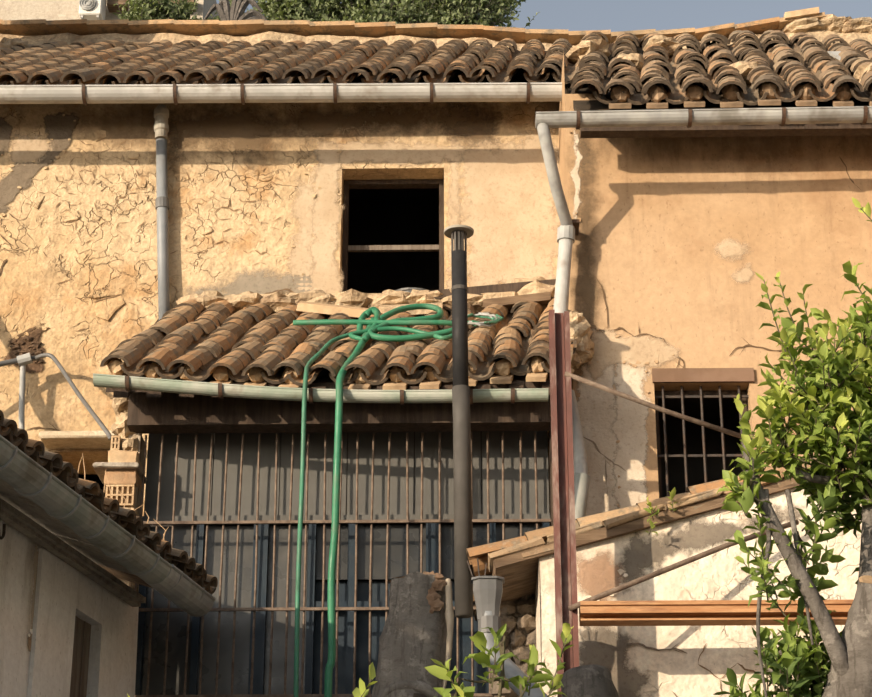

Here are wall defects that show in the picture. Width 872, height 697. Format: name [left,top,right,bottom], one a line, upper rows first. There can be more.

peeling [0,112,79,217]
crack [0,128,151,331]
crack [170,157,319,266]
peeling [716,239,753,282]
peeling [568,309,679,516]
peeling [577,552,628,601]
leakage [579,626,649,697]